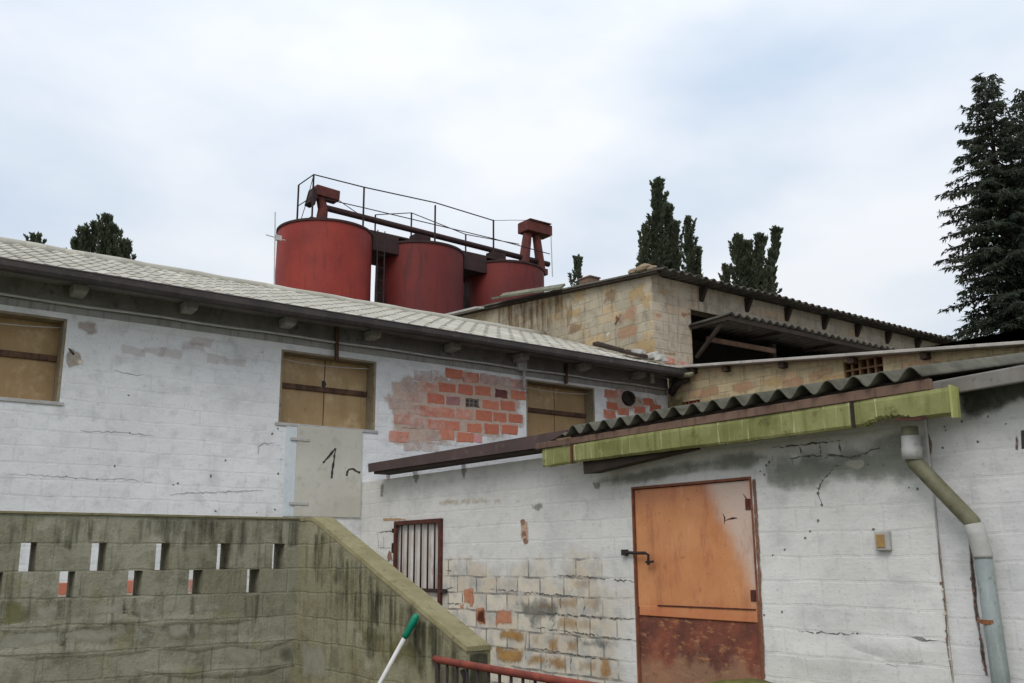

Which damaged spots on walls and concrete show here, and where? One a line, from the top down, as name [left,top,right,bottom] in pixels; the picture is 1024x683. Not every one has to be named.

spalling [67,348,83,367]
flaking render [387,367,527,451]
flaking render [603,389,661,419]
crack [81,429,152,437]
damp [777,438,908,481]
crack [9,473,144,481]
crack [173,488,262,496]
crack [772,440,879,556]
spalling [520,519,528,544]
rust [657,479,765,679]
damp [524,603,556,618]
damp [470,654,488,683]